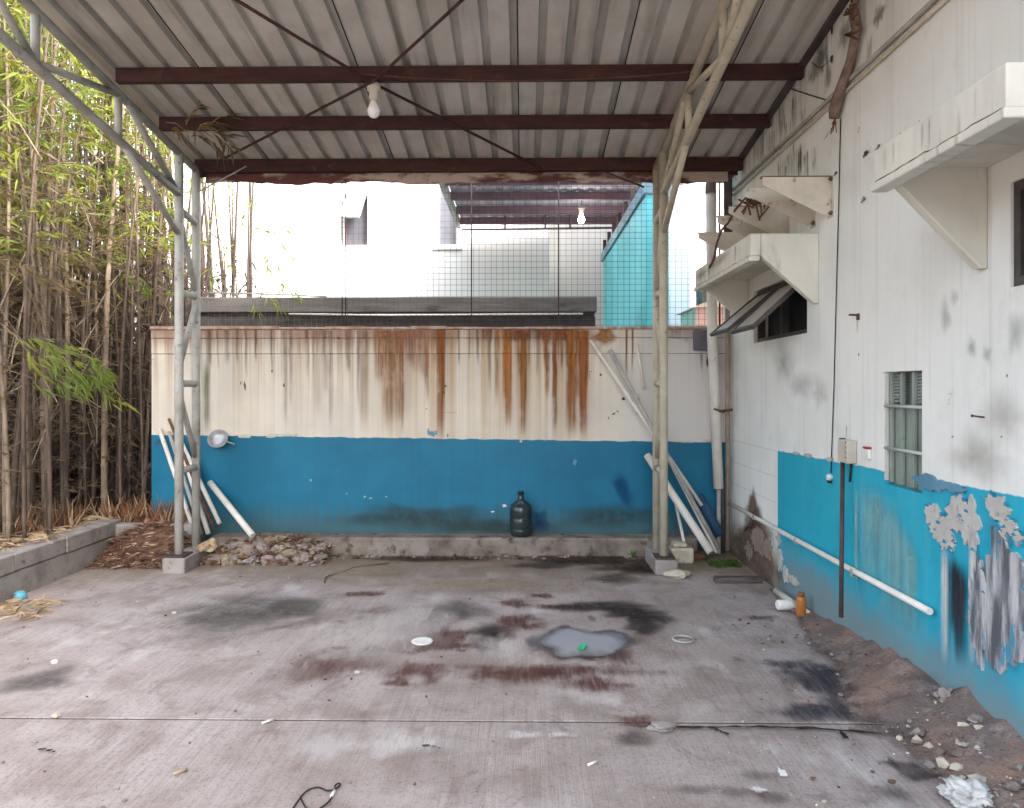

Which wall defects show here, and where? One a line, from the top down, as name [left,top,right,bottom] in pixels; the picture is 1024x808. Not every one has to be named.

rust [375,330,444,426]
rust [484,329,633,424]
flaking render [744,526,801,586]
peeling [911,473,1024,675]